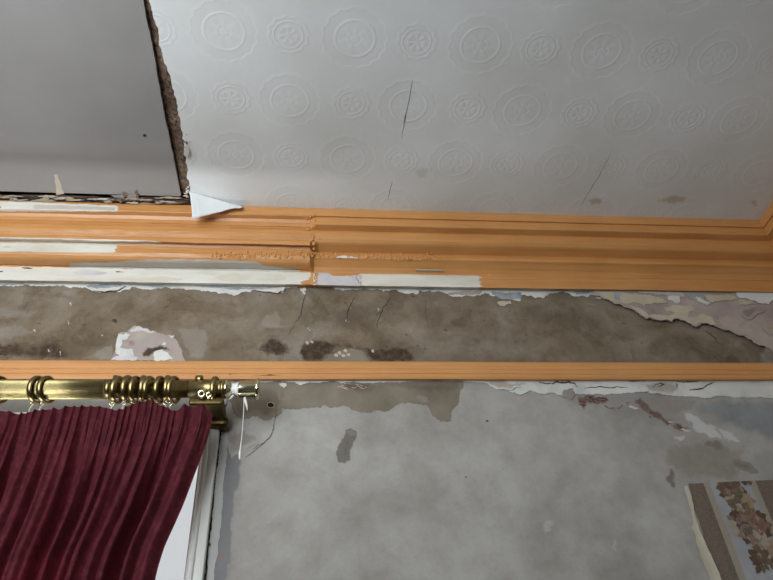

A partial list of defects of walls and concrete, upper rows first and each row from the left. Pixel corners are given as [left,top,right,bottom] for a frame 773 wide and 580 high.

crack [144,0,191,198]
leakage [136,291,621,362]
flaking render [0,237,773,363]
spalling [260,381,773,422]
leakage [335,428,357,464]